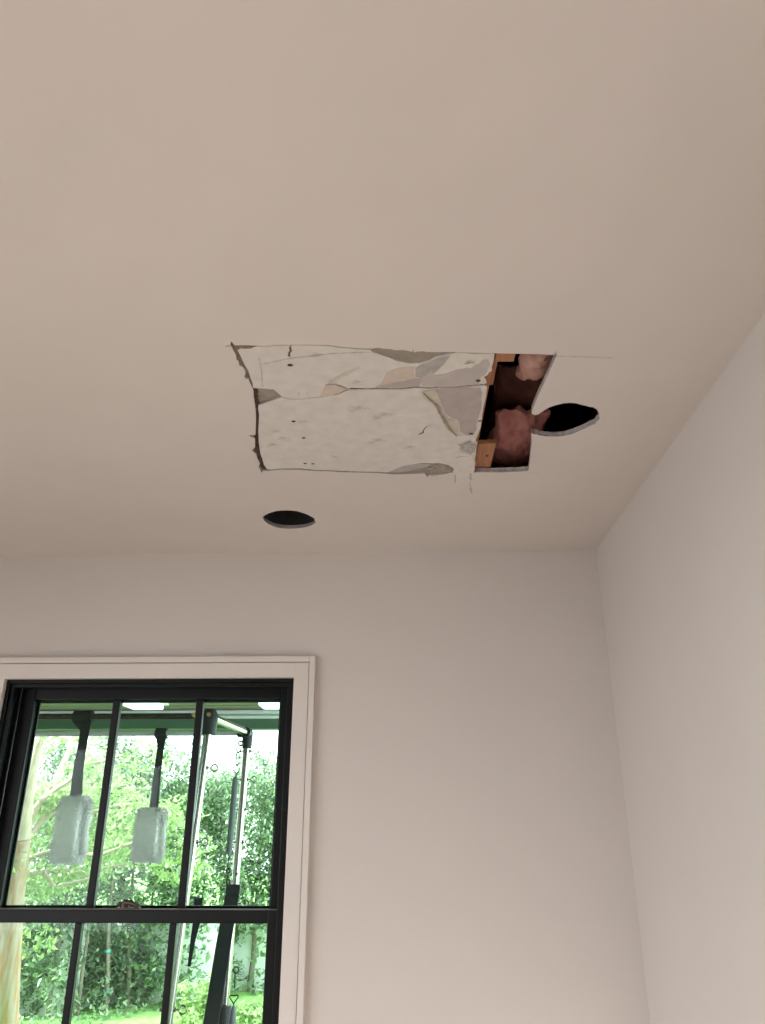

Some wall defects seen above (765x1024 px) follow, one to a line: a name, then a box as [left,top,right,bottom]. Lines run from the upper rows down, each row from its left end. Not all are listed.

spalling [249,428,453,477]
hole [474,410,600,472]